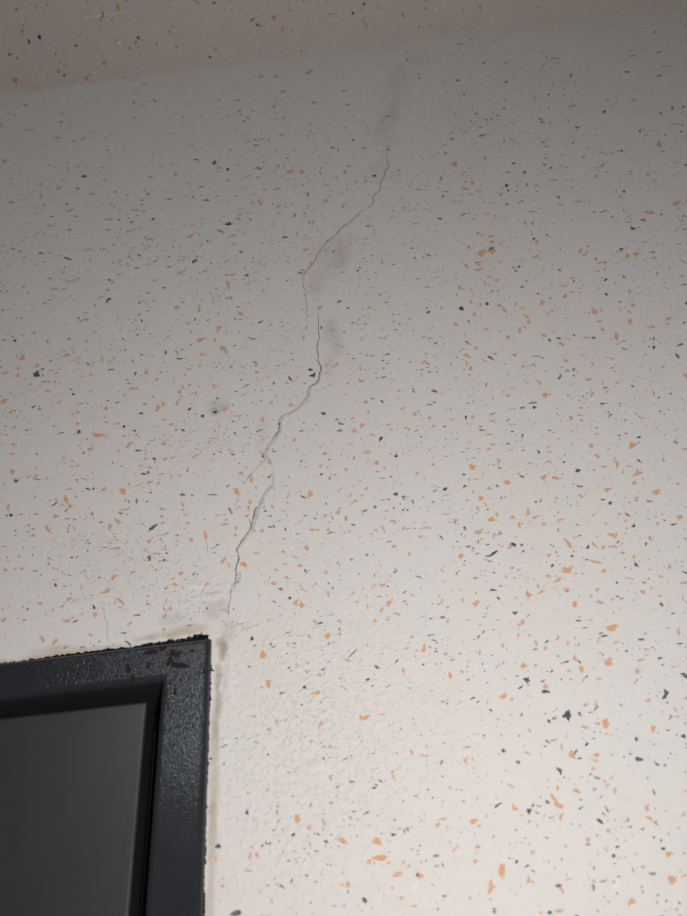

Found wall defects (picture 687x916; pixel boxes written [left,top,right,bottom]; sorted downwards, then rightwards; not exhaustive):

crack [219,108,396,630]